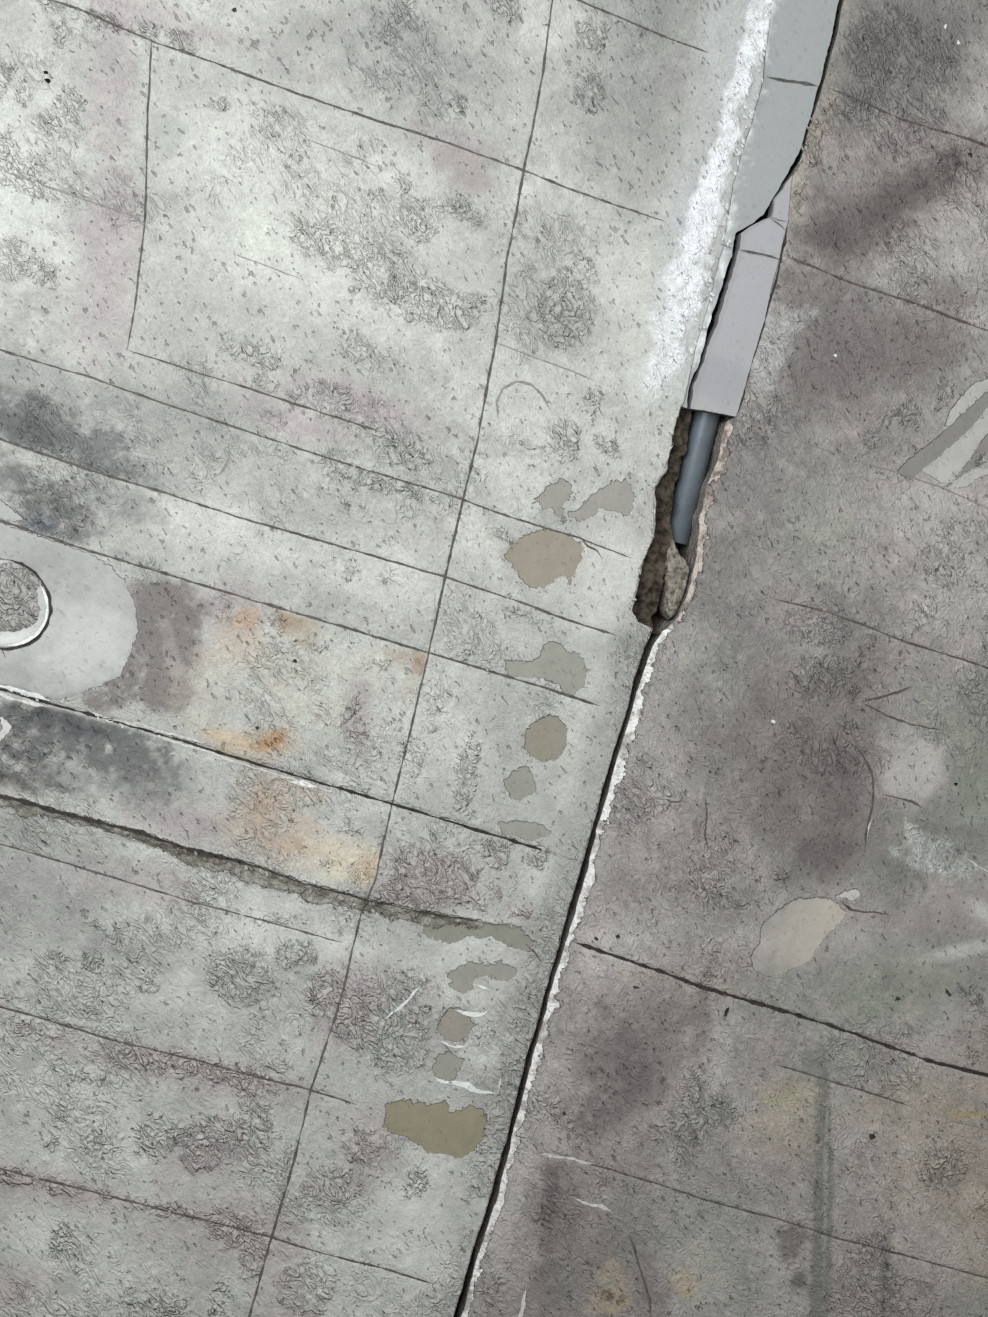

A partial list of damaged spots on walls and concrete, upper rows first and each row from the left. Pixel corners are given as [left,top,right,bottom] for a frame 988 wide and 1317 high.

crack [766,76,819,87]
damp [617,0,776,423]
crack [699,149,801,415]
crack [496,381,551,417]
damp [0,371,242,830]
crack [0,794,480,922]
crack [0,649,550,853]
spalling [461,384,736,1317]
crack [859,686,941,730]
peeling [0,639,591,1317]
crack [575,942,988,1077]
crack [454,1250,473,1317]